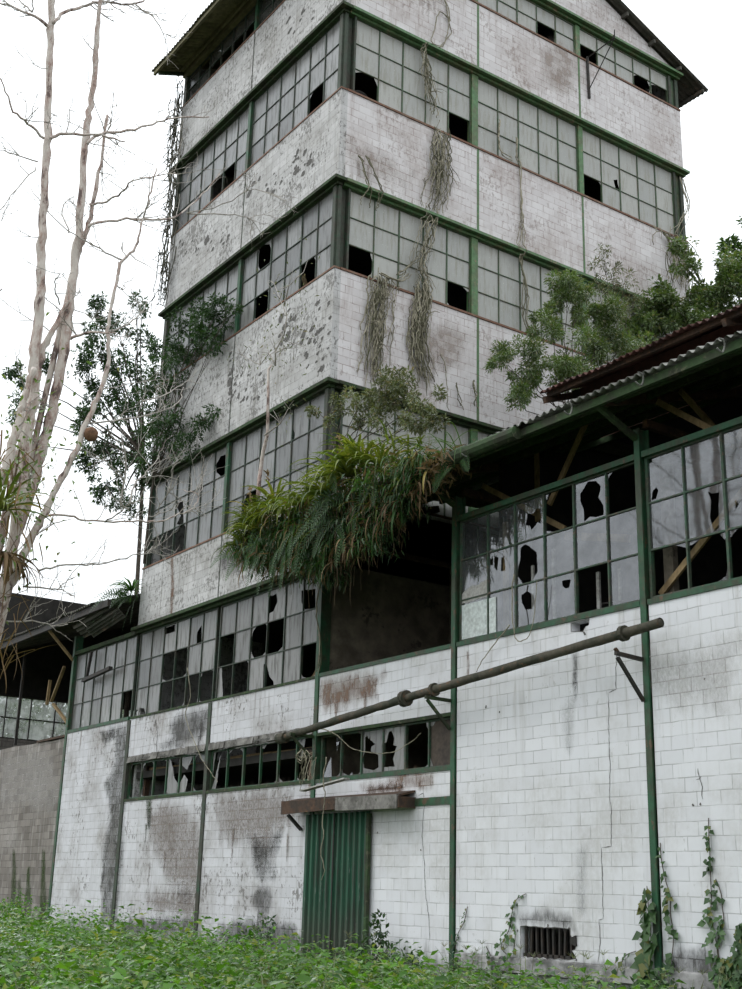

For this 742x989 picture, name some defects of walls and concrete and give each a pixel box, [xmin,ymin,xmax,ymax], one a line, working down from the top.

damp [123,799,199,933]
damp [216,788,291,880]